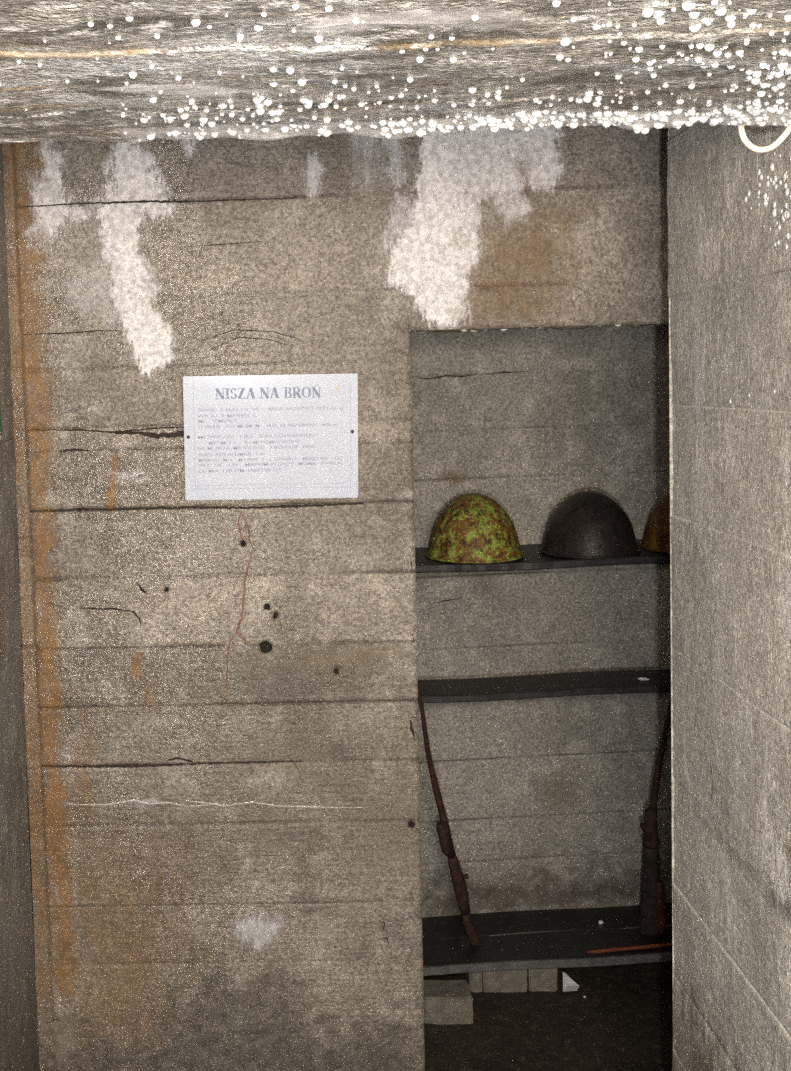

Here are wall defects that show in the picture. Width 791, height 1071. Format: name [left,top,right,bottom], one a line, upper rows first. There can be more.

leakage [25,139,180,379]
leakage [180,138,197,158]
leakage [349,126,565,330]
crack [30,502,364,704]